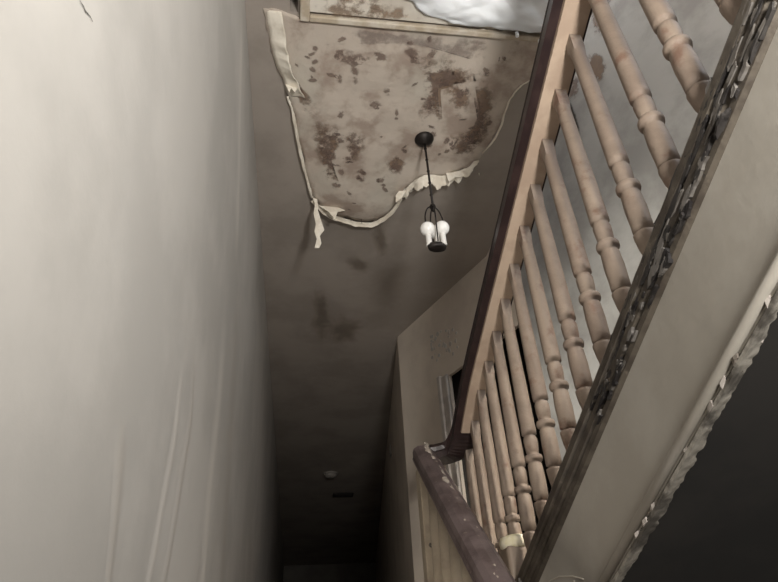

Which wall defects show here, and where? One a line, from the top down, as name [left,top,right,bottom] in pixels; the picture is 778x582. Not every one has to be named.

water stain [328,0,363,17]
water stain [371,6,403,18]
peeling [263,8,538,248]
spalling [611,289,778,582]